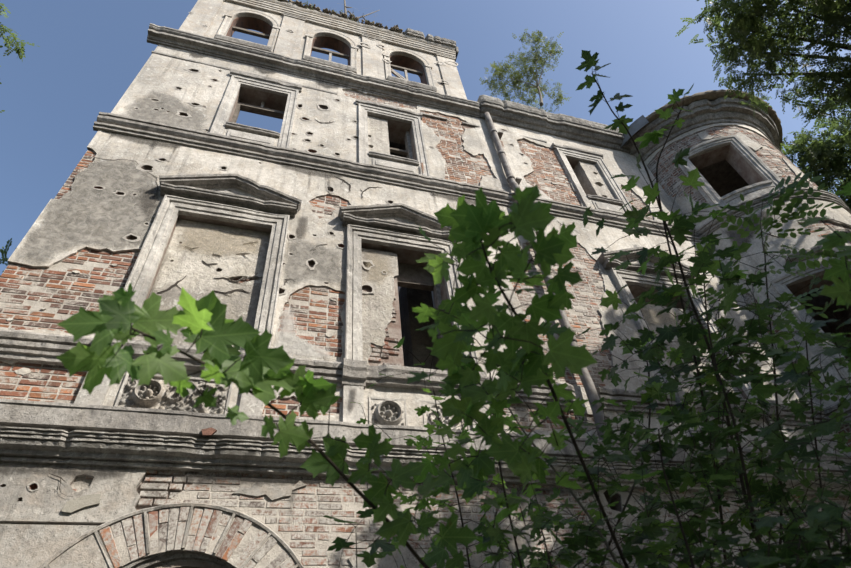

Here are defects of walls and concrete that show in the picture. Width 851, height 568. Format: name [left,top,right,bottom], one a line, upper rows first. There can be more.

spalling [291,131,341,156]
flaking render [309,185,350,219]
flaking render [317,90,496,186]
flaking render [508,139,581,206]
peeling [0,149,170,333]
crack [157,276,186,293]
crack [185,242,262,298]
flaking render [278,231,345,362]
flaking render [368,296,401,366]
flaking render [0,361,88,404]
flaking render [138,470,851,568]